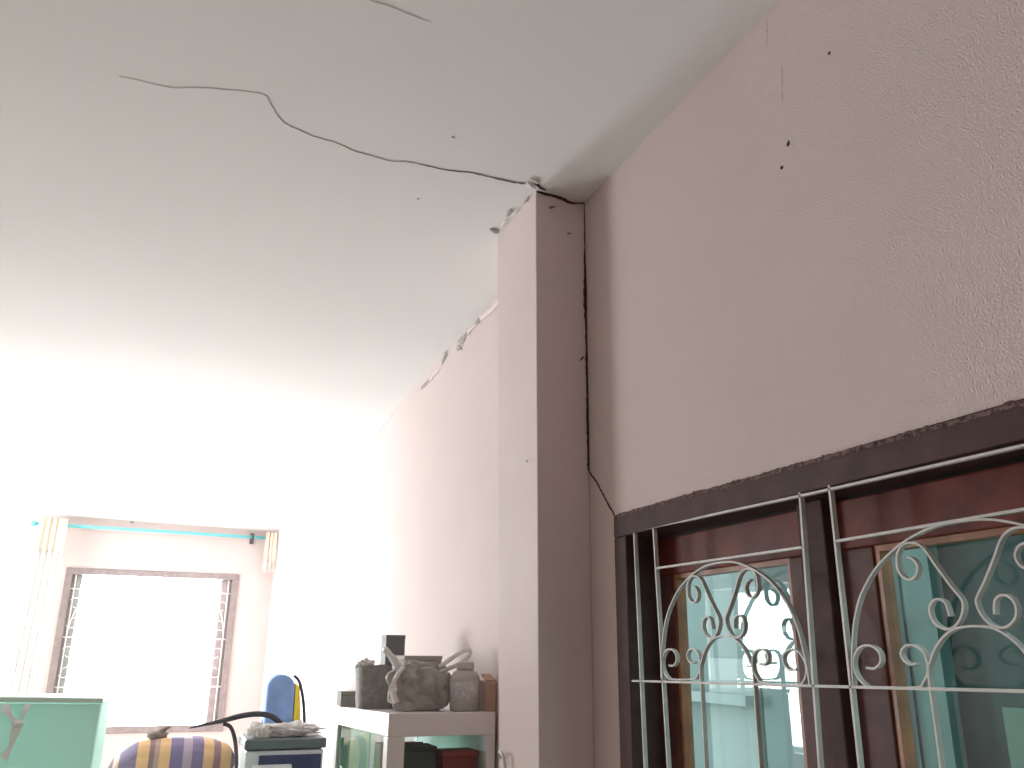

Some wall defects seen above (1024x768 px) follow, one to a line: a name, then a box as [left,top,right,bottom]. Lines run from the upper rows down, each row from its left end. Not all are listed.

peeling [490,196,529,234]
crack [122,77,615,517]
peeling [404,300,498,405]